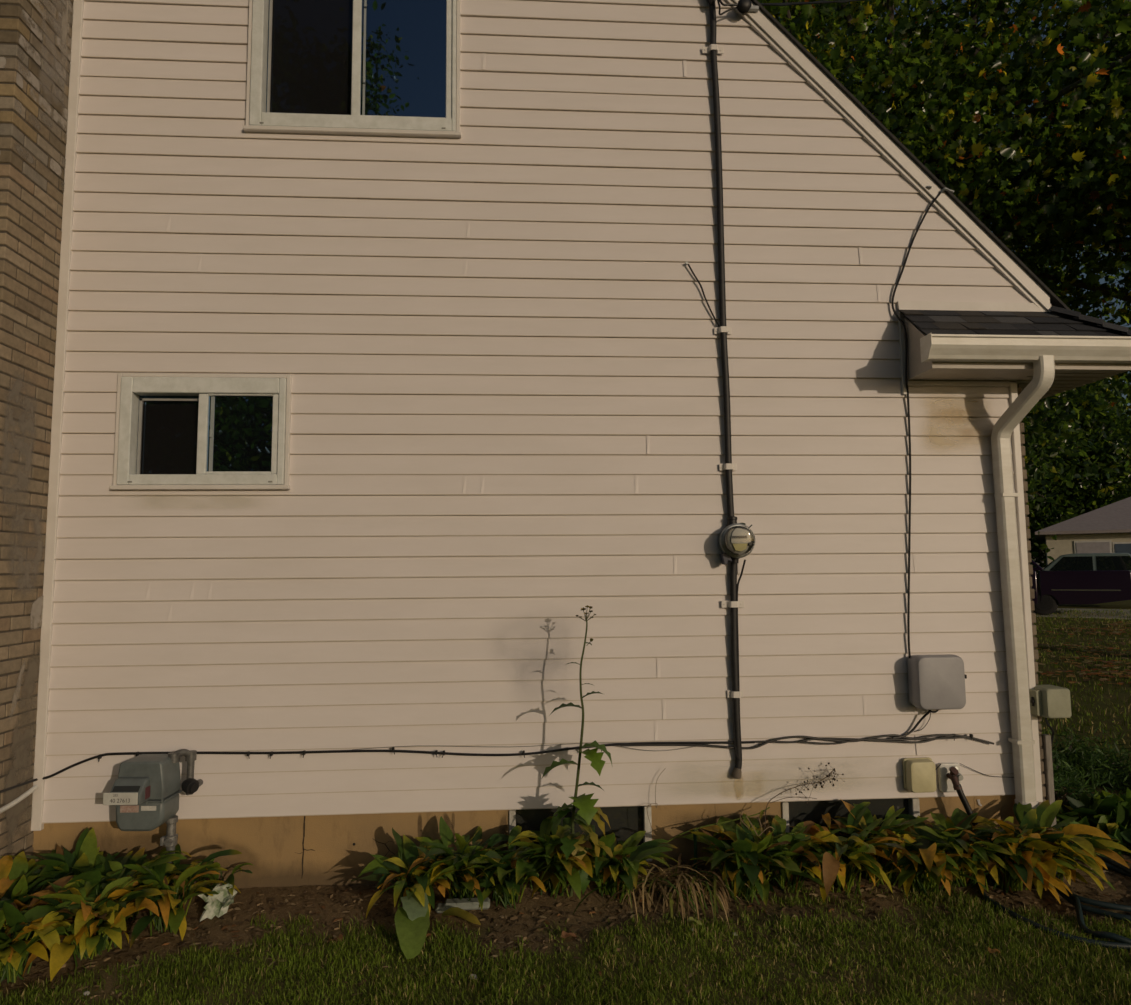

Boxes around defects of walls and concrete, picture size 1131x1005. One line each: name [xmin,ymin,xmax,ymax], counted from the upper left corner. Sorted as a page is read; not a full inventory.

leakage [0,0,73,130]